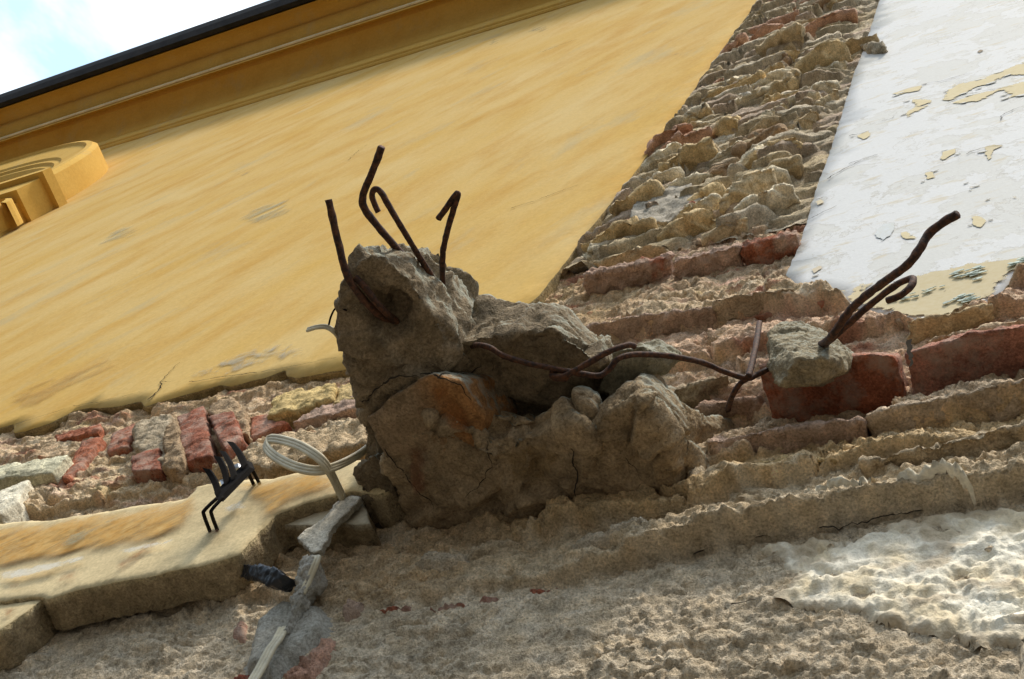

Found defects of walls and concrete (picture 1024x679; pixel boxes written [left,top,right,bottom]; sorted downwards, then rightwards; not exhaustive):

flaking render [282,0,1024,679]
spalling [0,377,368,578]
flaking render [0,547,310,679]